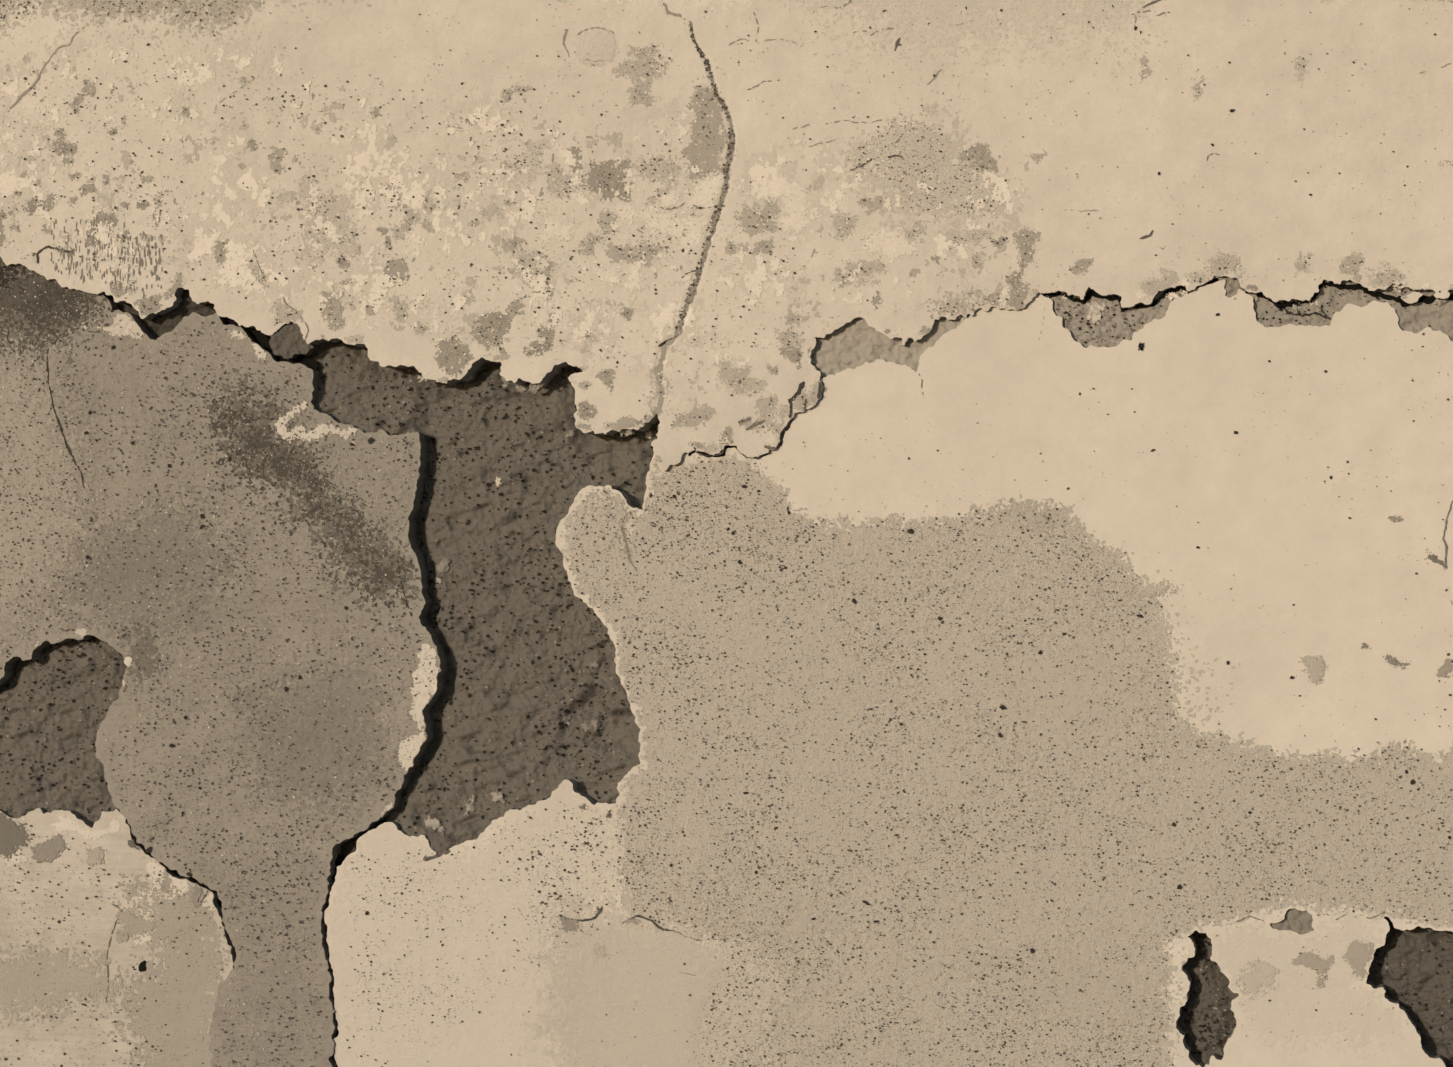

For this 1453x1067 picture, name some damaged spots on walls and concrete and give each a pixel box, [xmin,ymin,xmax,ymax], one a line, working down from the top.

crack [637,0,900,429]
crack [691,347,822,459]
crack [172,870,236,953]
crack [326,854,343,944]